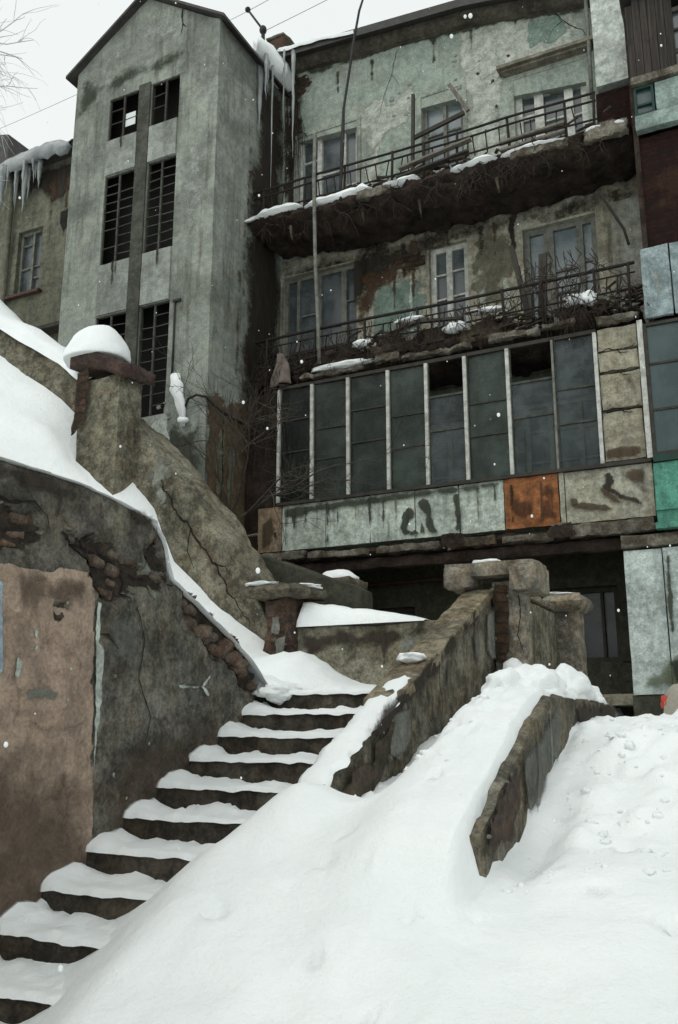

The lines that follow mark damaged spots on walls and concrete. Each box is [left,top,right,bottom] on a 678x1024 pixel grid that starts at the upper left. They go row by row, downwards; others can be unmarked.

peeling [452,15,576,159]
peeling [374,253,428,338]
spalling [0,501,43,550]
crack [161,480,250,624]
water stain [262,483,498,546]
corrosion [510,482,556,522]
water stain [570,473,641,510]
spalling [182,591,259,703]
peeling [0,527,167,915]